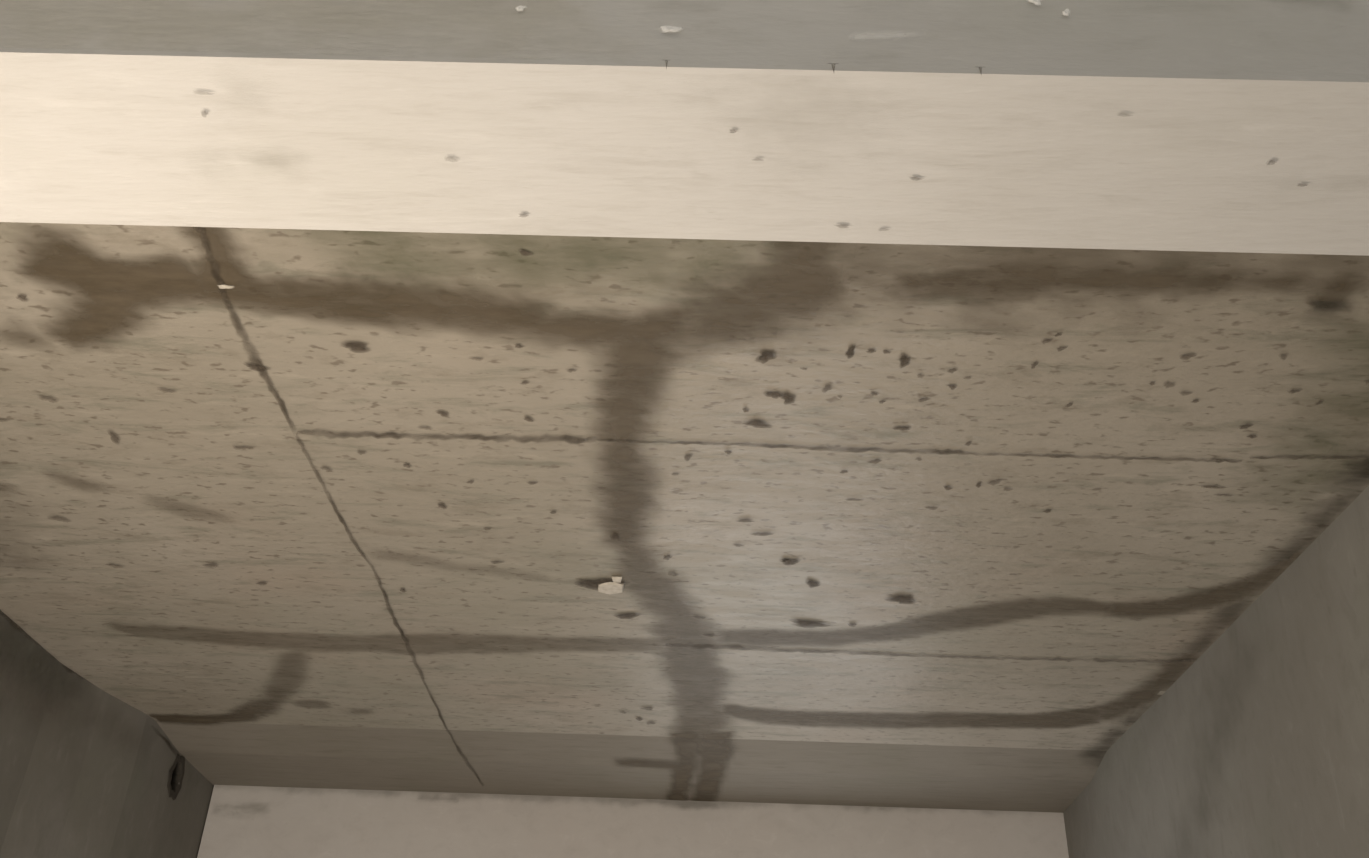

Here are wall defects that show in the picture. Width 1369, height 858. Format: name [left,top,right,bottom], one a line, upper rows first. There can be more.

crack [201,230,241,331]
water stain [1314,275,1358,310]
crack [254,360,289,421]
crack [339,432,404,440]
crack [437,436,963,454]
crack [1019,453,1158,461]
crack [1214,455,1355,463]
water stain [23,227,1301,802]
crack [316,473,406,640]
crack [5,615,23,630]
crack [431,697,479,780]